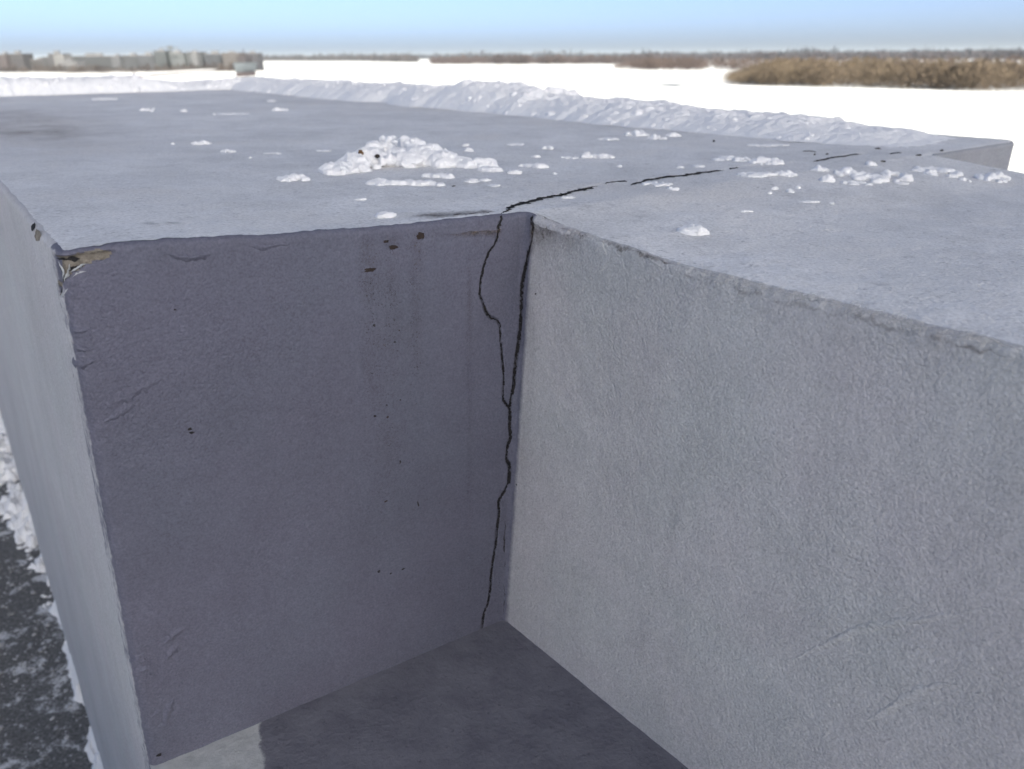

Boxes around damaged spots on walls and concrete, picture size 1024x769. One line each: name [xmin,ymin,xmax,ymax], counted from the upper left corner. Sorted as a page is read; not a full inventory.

crack [804,151,858,162]
spalling [56,249,112,298]
crack [478,167,738,629]